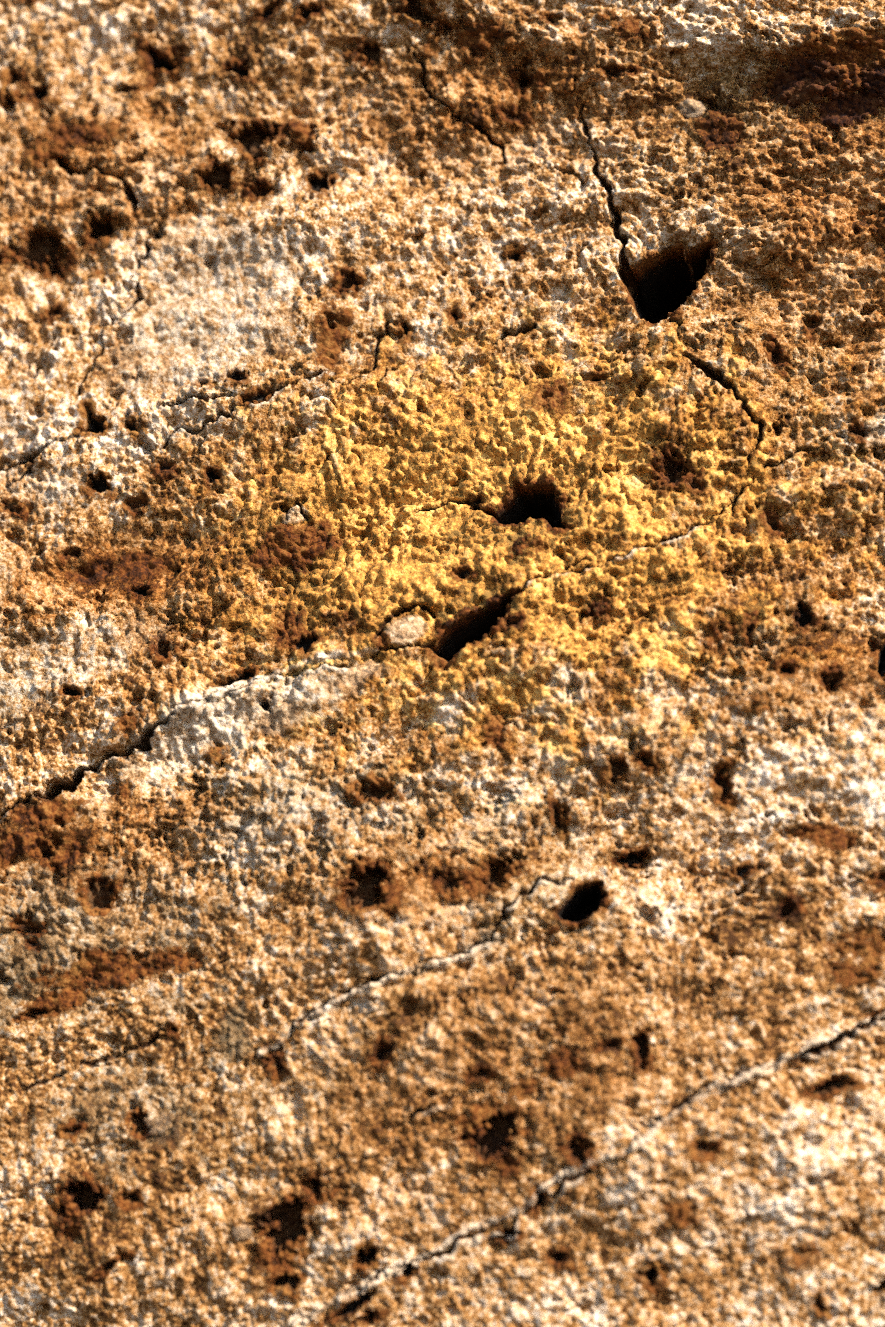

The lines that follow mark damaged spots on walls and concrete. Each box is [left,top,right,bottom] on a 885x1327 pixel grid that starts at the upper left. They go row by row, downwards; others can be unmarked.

crack [556,77,639,304]
crack [0,604,436,820]
crack [291,877,568,1032]
crack [636,1018,885,1140]
crack [338,1223,518,1300]
crack [557,1175,583,1195]